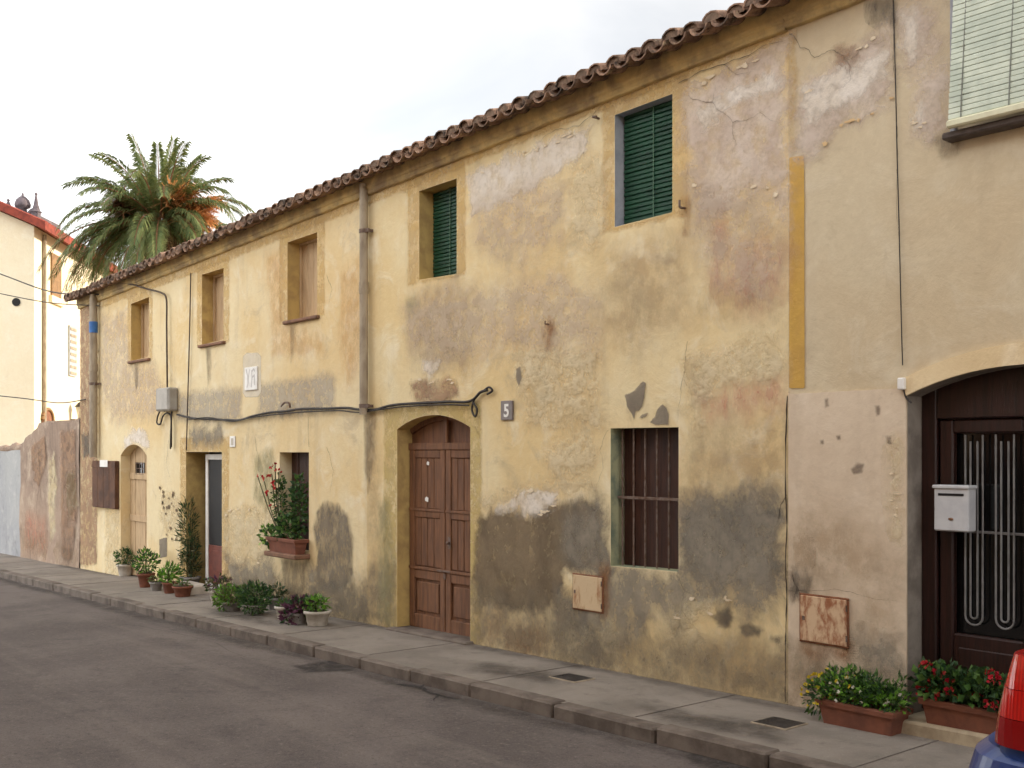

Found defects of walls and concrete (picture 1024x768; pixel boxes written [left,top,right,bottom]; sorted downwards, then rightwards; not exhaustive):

peeling [468,130,587,215]
peeling [683,38,787,219]
crack [679,33,895,157]
peeling [802,51,887,123]
spalling [412,360,457,401]
spalling [625,382,669,425]
leakage [226,504,391,624]
peeling [495,488,557,516]
leakage [473,485,811,692]
crack [779,396,879,702]